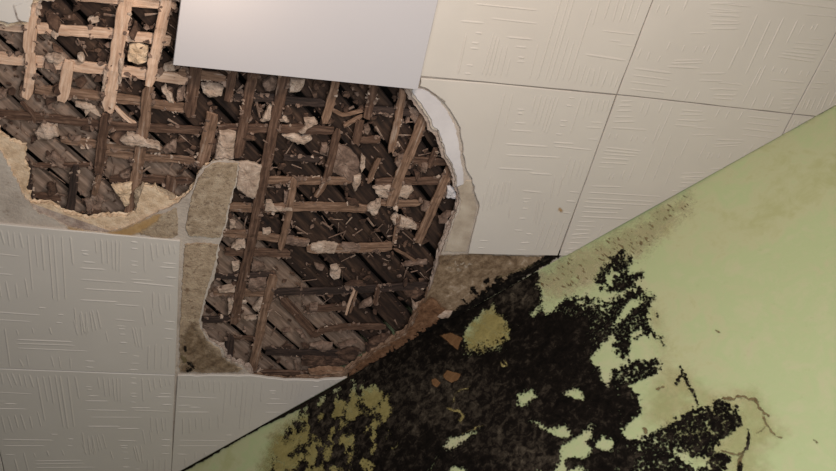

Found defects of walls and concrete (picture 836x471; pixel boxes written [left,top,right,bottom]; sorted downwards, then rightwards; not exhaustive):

spalling [0,0,477,379]
damp [266,221,782,471]